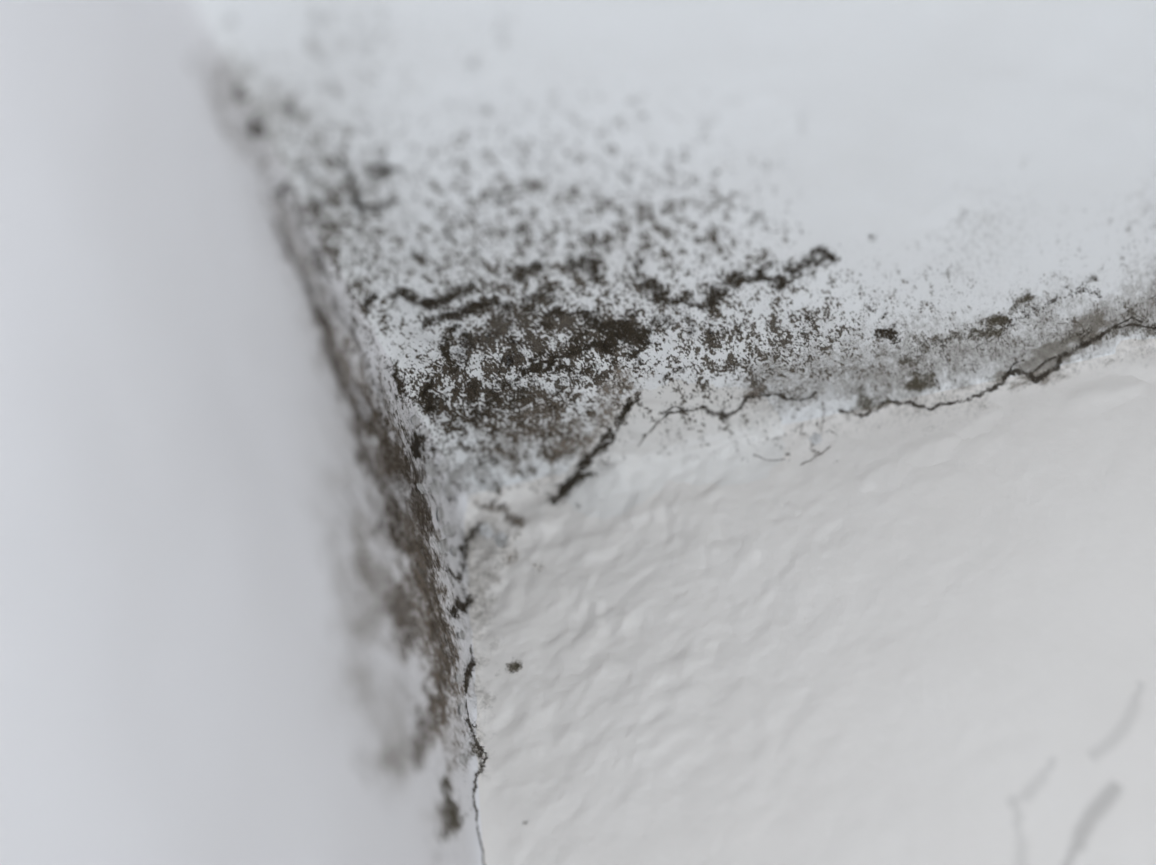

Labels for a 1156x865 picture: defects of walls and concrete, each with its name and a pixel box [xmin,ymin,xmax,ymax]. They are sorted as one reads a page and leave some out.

leakage [206,56,1156,842]
crack [546,295,1156,502]
crack [465,645,488,865]